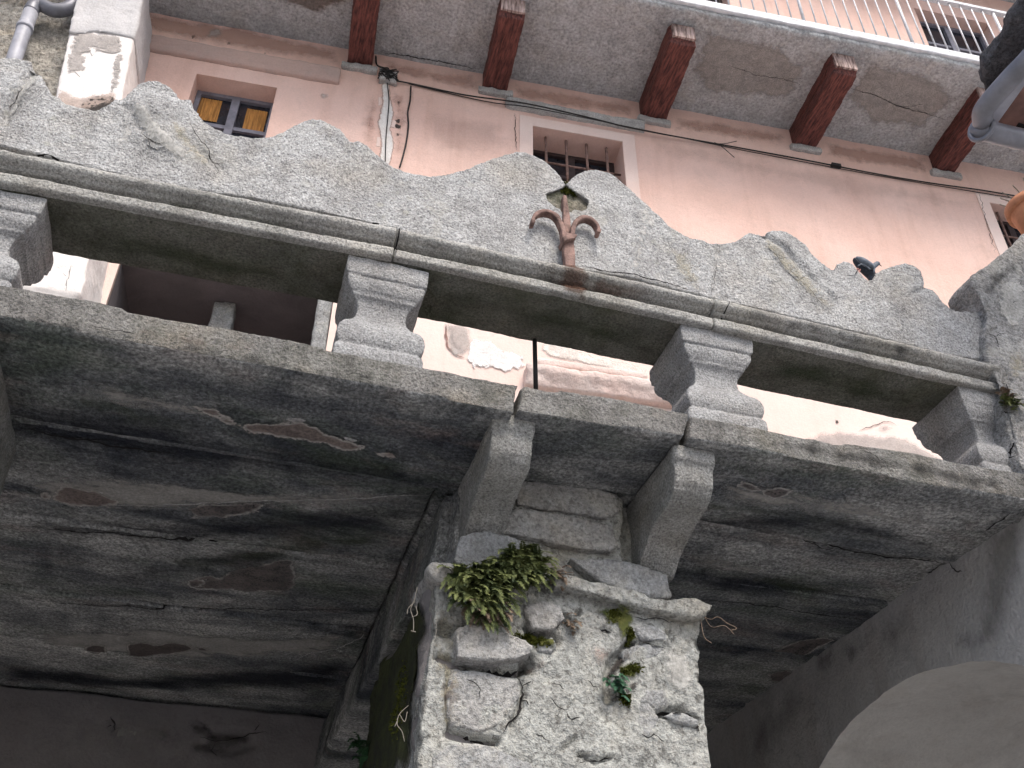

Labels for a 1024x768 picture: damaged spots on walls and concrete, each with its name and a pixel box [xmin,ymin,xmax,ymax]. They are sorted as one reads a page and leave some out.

peeling [67,33,123,92]
peeling [376,83,396,165]
rust [559,266,587,293]
peeling [449,326,525,372]
peeling [193,406,396,460]
peeling [188,502,263,519]
crack [804,540,961,574]
spalling [126,643,211,657]